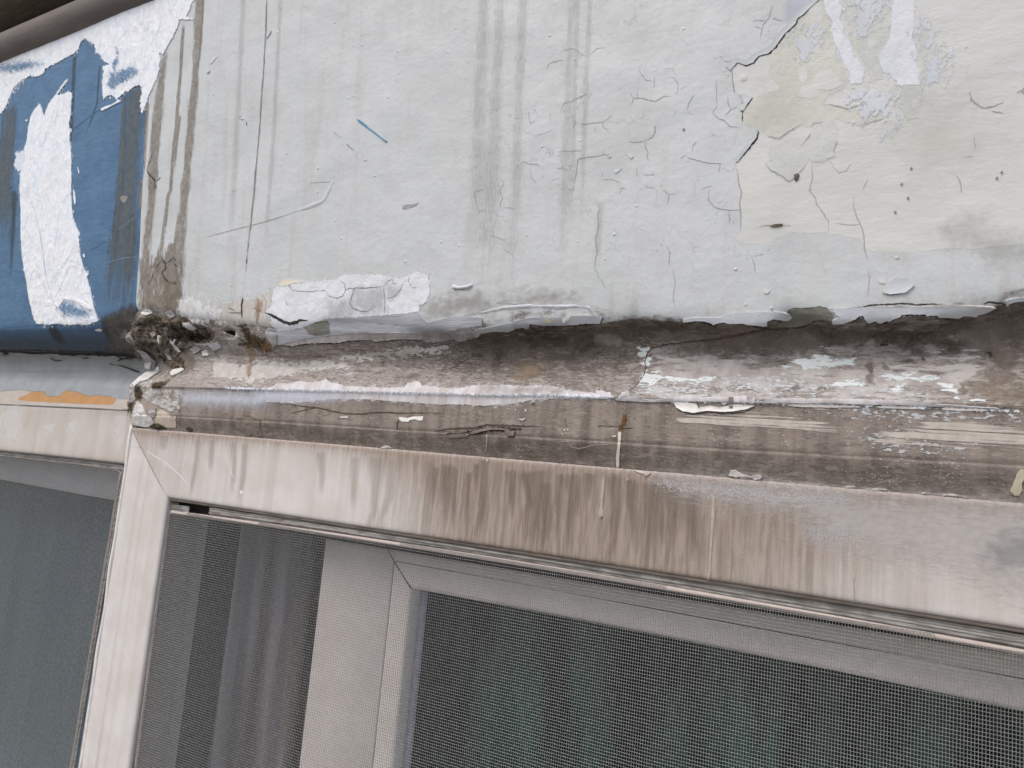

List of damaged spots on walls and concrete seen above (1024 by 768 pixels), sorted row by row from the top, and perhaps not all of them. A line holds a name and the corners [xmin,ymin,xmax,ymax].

damp [105,0,204,317]
crack [514,59,740,285]
peeling [725,0,1024,253]
peeling [0,271,1024,429]
damp [443,309,1024,384]